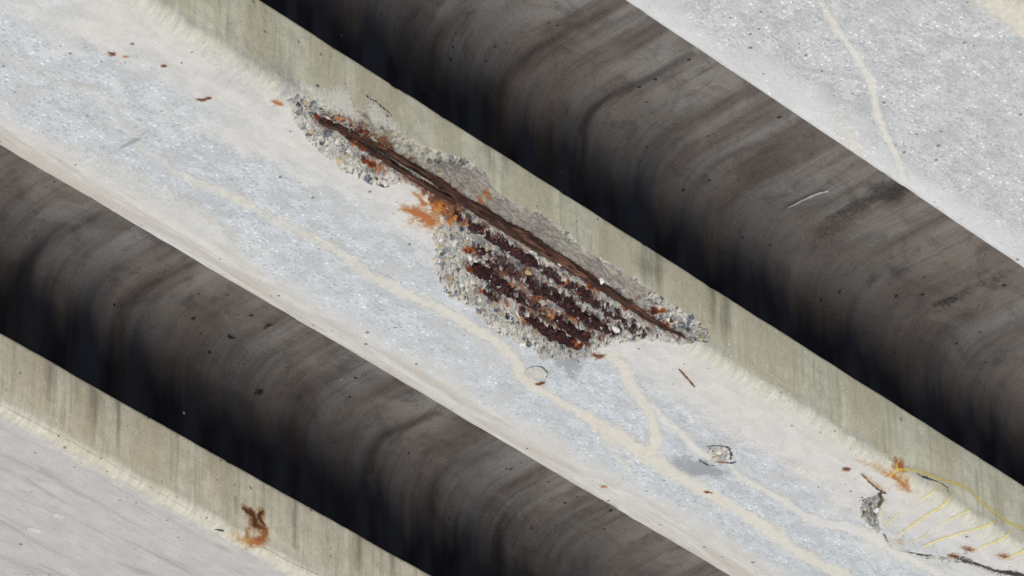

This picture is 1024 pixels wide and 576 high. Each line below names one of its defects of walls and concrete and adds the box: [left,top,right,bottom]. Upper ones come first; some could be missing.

spalling [283,83,713,366]
spalling [699,442,737,467]
rust [875,457,910,492]
rust [239,506,268,546]
spalling [854,475,887,535]
crack [883,534,1024,576]